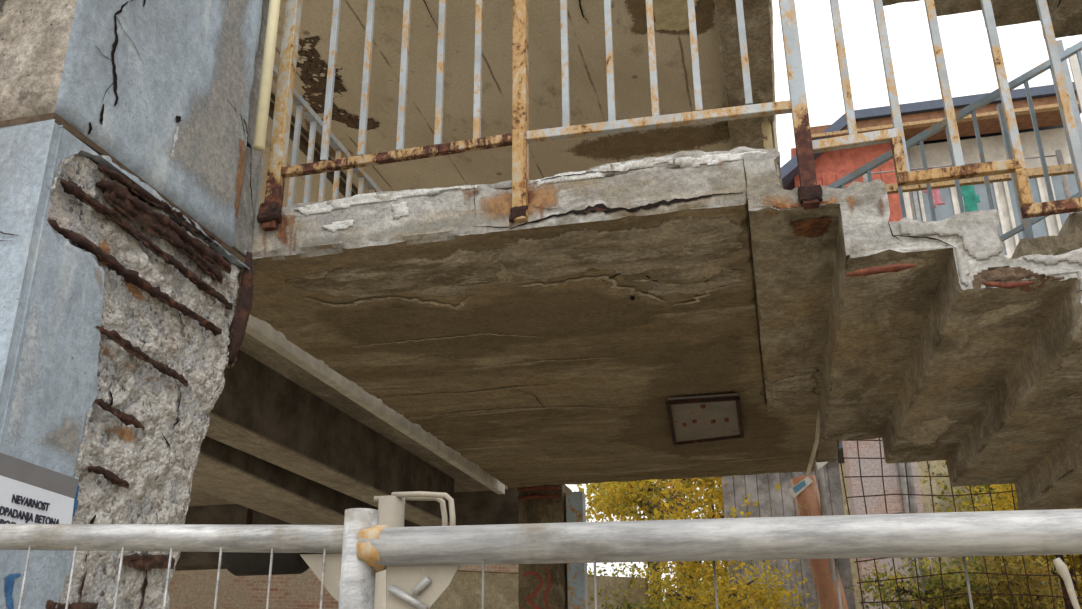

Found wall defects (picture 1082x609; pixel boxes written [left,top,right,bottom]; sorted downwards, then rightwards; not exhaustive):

damp [625,0,715,36]
crack [88,0,146,134]
damp [567,106,730,161]
crack [472,168,743,229]
rust [789,197,858,238]
peeling [899,210,1082,294]
spalling [47,155,254,524]
rust [108,427,134,442]
spalling [46,551,180,609]